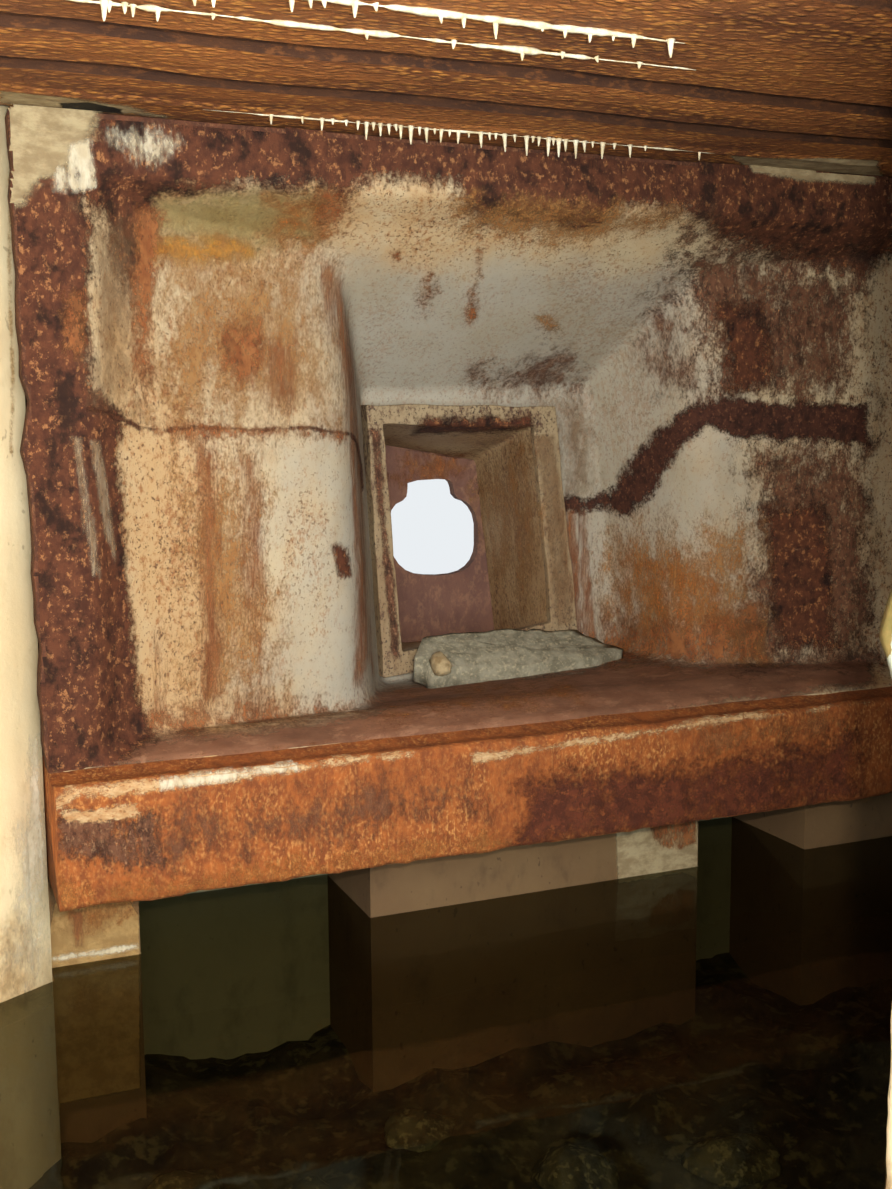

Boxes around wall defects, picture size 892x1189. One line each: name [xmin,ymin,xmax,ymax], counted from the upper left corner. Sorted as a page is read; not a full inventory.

crack [87,407,364,491]
corrosion [10,117,892,773]
corrosion [50,773,477,944]
corrosion [514,710,864,846]